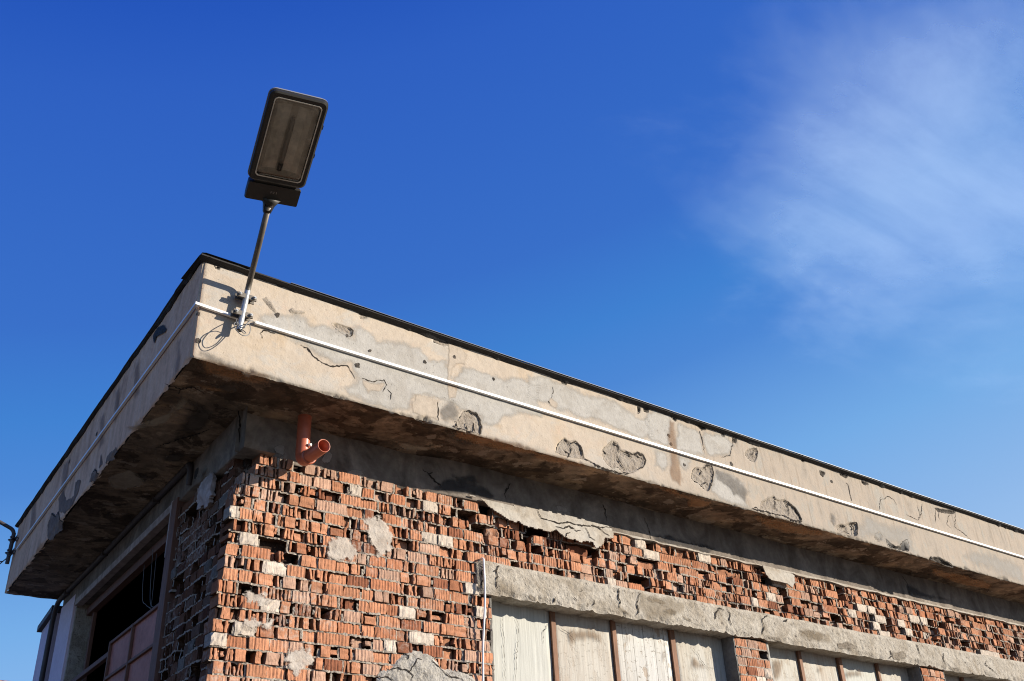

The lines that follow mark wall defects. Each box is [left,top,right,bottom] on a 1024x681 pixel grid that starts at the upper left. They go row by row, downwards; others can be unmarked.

crack [303,346,392,400]
peeling [261,297,802,522]
peeling [469,495,1024,628]
spalling [802,630,823,640]
spalling [838,642,857,650]